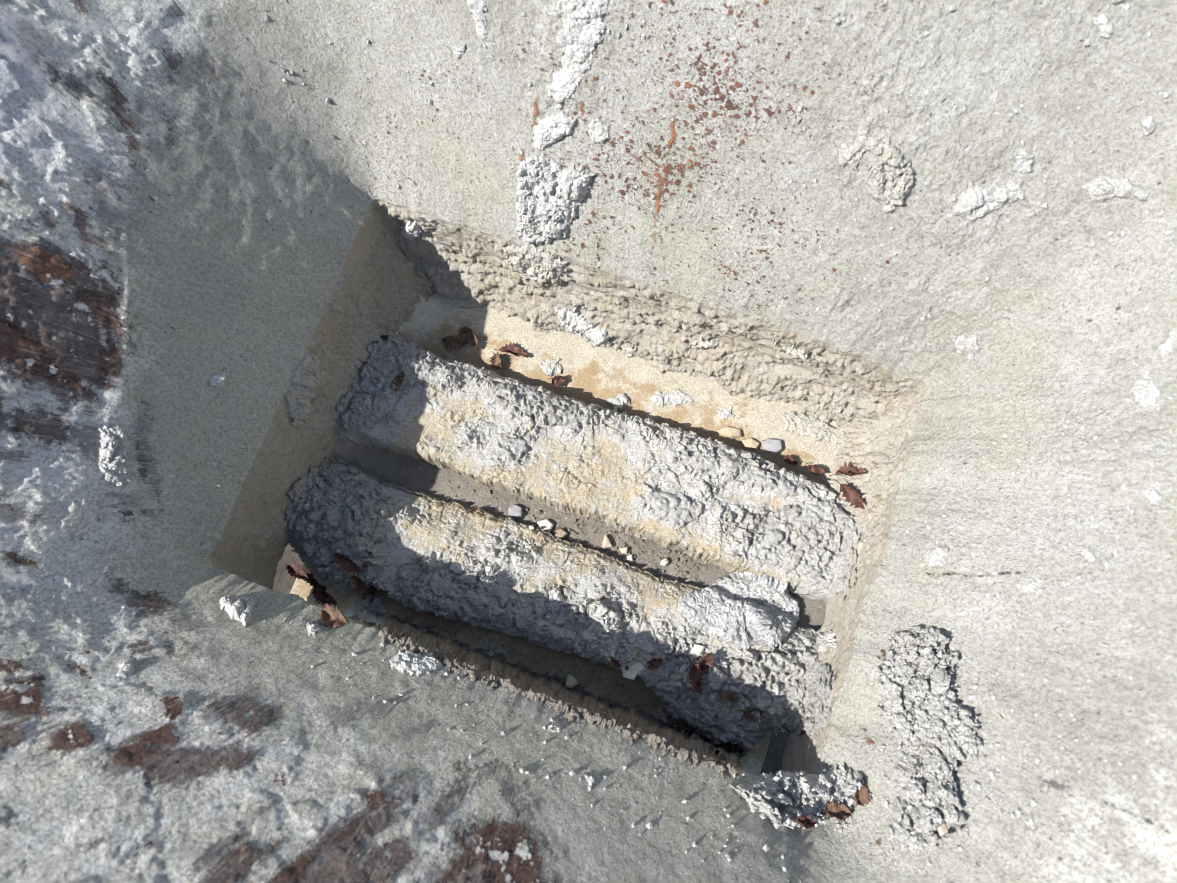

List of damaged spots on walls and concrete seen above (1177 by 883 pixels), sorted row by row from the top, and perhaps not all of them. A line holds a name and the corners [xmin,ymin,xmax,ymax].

corrosion [412,0,894,325]
corrosion [0,214,140,416]
spalling [717,426,783,455]
spalling [508,504,568,538]
spalling [603,534,633,562]
corrosion [67,646,92,680]
corrosion [124,630,175,656]
peeling [622,662,647,680]
peeling [679,643,705,675]
corrosion [0,658,258,794]
peeling [186,681,284,744]
corrosion [419,784,562,883]